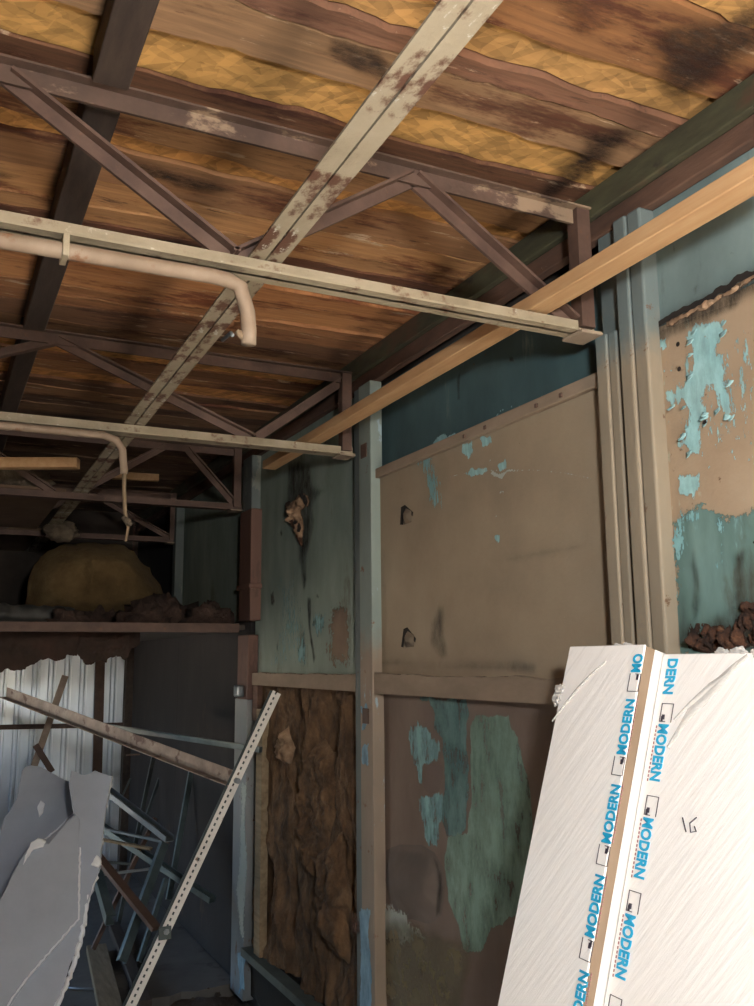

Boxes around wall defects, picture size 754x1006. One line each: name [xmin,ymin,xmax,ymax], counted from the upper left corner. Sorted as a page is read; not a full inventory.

water stain [662,9,754,93]
peeling [665,319,753,458]
water stain [289,464,314,584]
peeling [672,467,754,654]
peeling [409,696,533,952]
peeling [385,903,421,940]